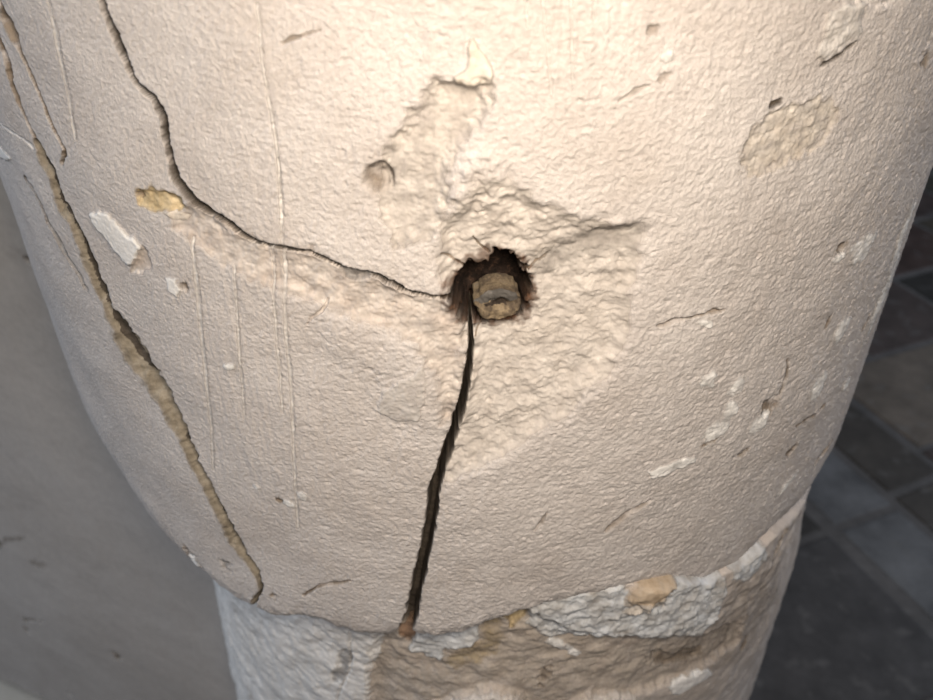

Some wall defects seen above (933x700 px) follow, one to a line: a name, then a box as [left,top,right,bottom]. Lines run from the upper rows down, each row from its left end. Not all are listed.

crack [101,0,341,266]
crack [0,4,264,604]
peeling [131,246,152,275]
spalling [173,39,641,482]
corrosion [441,245,537,324]
crack [523,252,547,270]
crack [371,253,481,626]
peeling [726,529,787,582]
spalling [371,609,746,700]